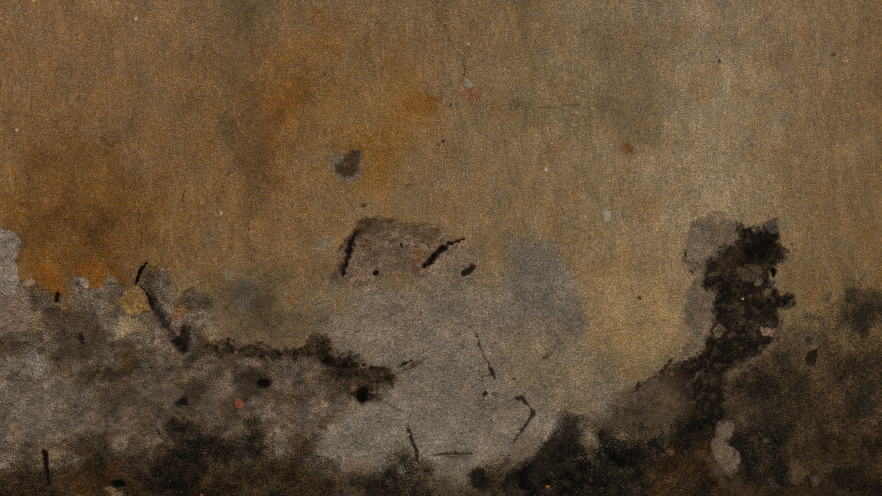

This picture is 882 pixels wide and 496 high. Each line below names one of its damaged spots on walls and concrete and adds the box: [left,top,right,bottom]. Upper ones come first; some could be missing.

spalling [330,147,364,184]
spalling [0,215,636,487]
leakage [0,218,882,496]
spalling [666,211,781,376]
peeling [103,479,126,496]